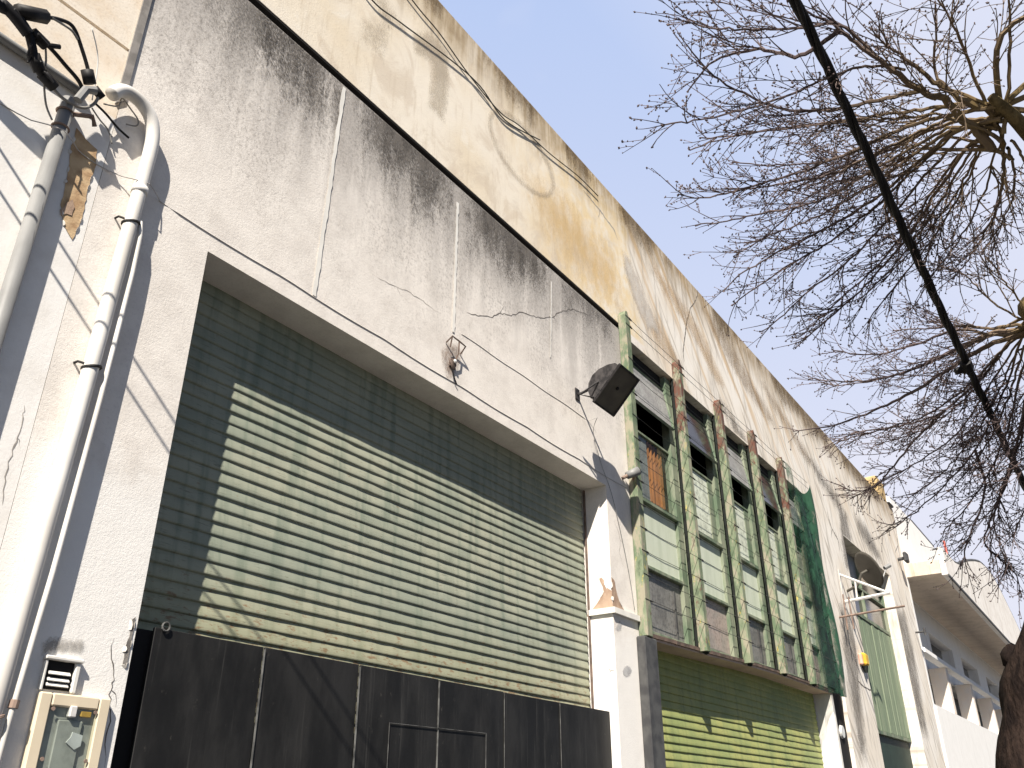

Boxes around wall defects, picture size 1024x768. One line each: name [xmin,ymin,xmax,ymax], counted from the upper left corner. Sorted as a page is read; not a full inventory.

damp [217,0,341,119]
damp [360,106,453,220]
damp [565,144,588,181]
damp [466,201,546,291]
crack [467,309,590,325]
damp [569,291,610,336]
crack [2,406,25,504]